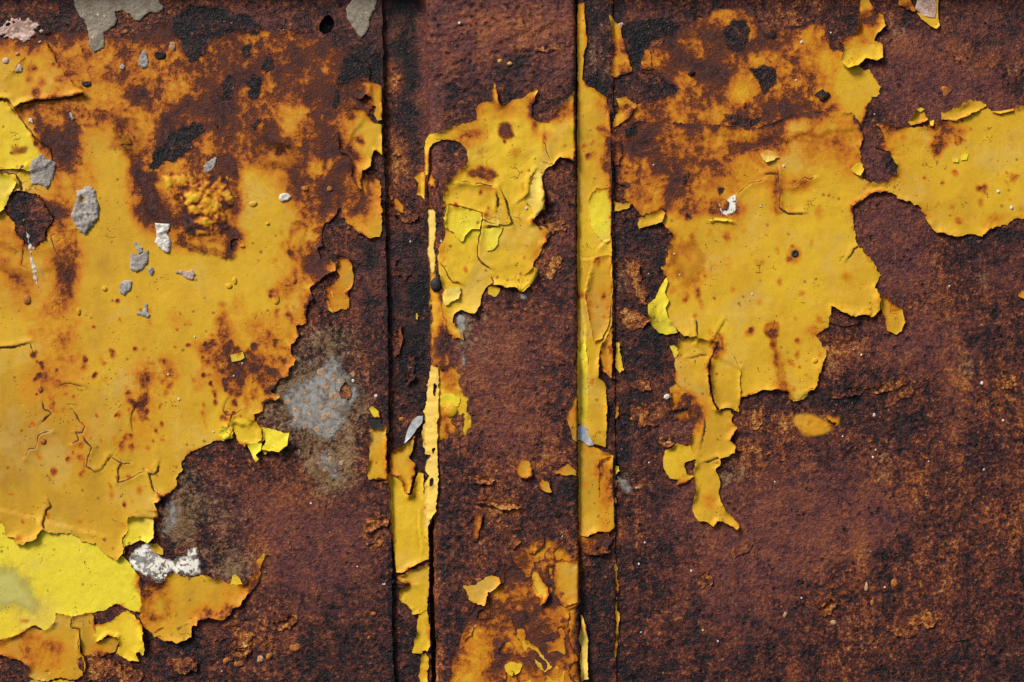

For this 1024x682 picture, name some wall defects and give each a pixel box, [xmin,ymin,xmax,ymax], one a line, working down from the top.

rust [172,4,263,63]
rust [222,54,274,100]
crack [0,342,32,350]
rust [0,190,77,297]
rust [109,122,236,260]
peeling [0,20,404,682]
crack [462,141,550,285]
rust [620,259,650,331]
peeling [367,0,1024,682]
crack [25,383,159,494]
rust [793,414,840,436]
rust [221,628,273,667]